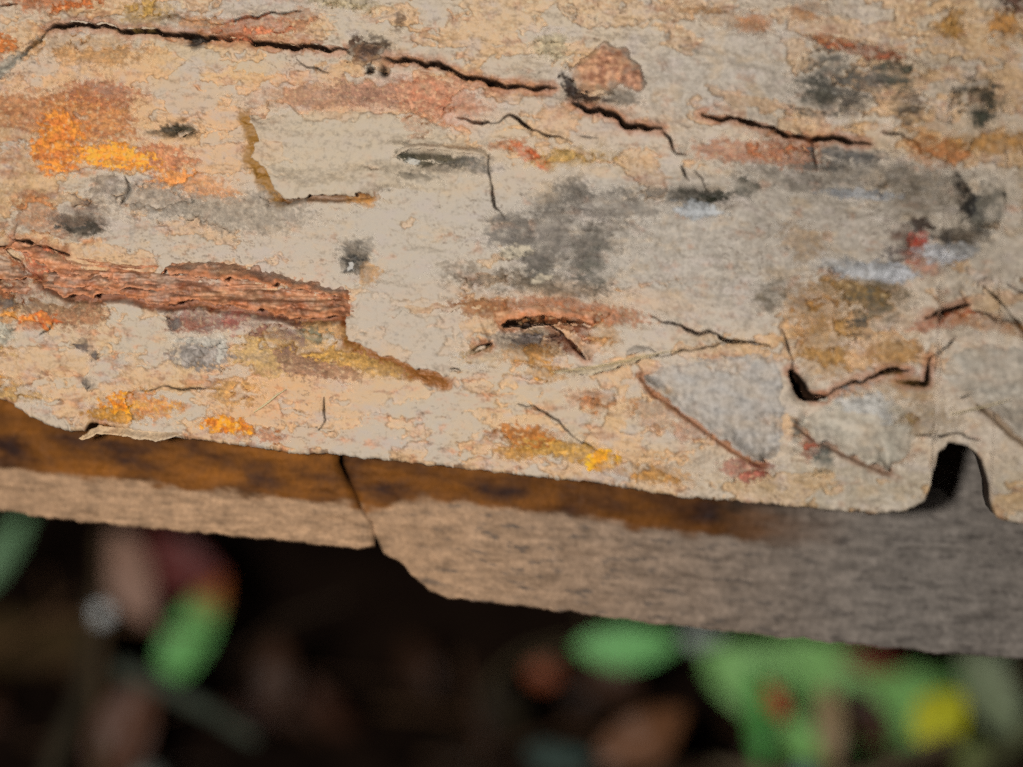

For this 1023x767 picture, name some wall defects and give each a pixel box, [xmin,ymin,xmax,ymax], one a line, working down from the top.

crack [12,11,347,73]
corrosion [0,80,219,198]
crack [386,57,705,186]
crack [702,114,924,170]
leakage [794,43,923,135]
leakage [454,177,760,297]
corrosion [805,276,891,312]
corrosion [0,230,785,484]
crack [454,315,594,371]
crack [651,316,953,401]
corrosion [797,320,854,369]
corrosion [798,397,919,472]